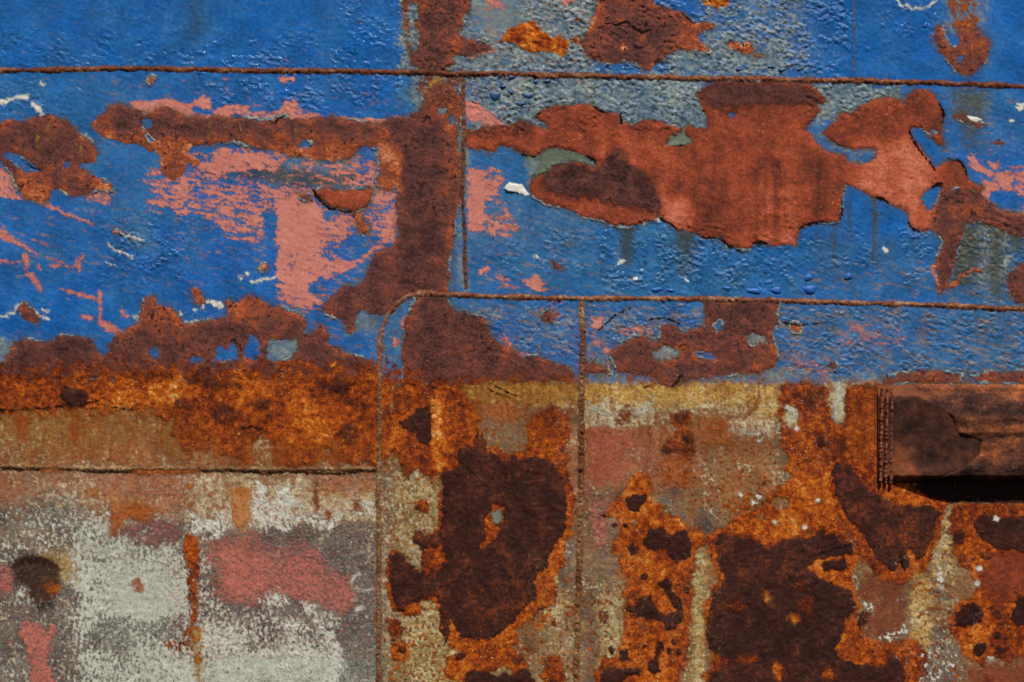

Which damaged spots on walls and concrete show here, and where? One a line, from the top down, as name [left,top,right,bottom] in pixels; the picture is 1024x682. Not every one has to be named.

rust [932,0,993,78]
peeling [130,95,324,121]
peeling [339,116,406,124]
peeling [0,168,28,200]
peeling [465,80,1024,252]
peeling [143,146,399,313]
peeling [178,299,224,324]
rust [0,0,716,682]
peeling [479,266,562,318]
peeling [591,316,611,353]
peeling [729,405,804,443]
rust [580,368,1024,682]